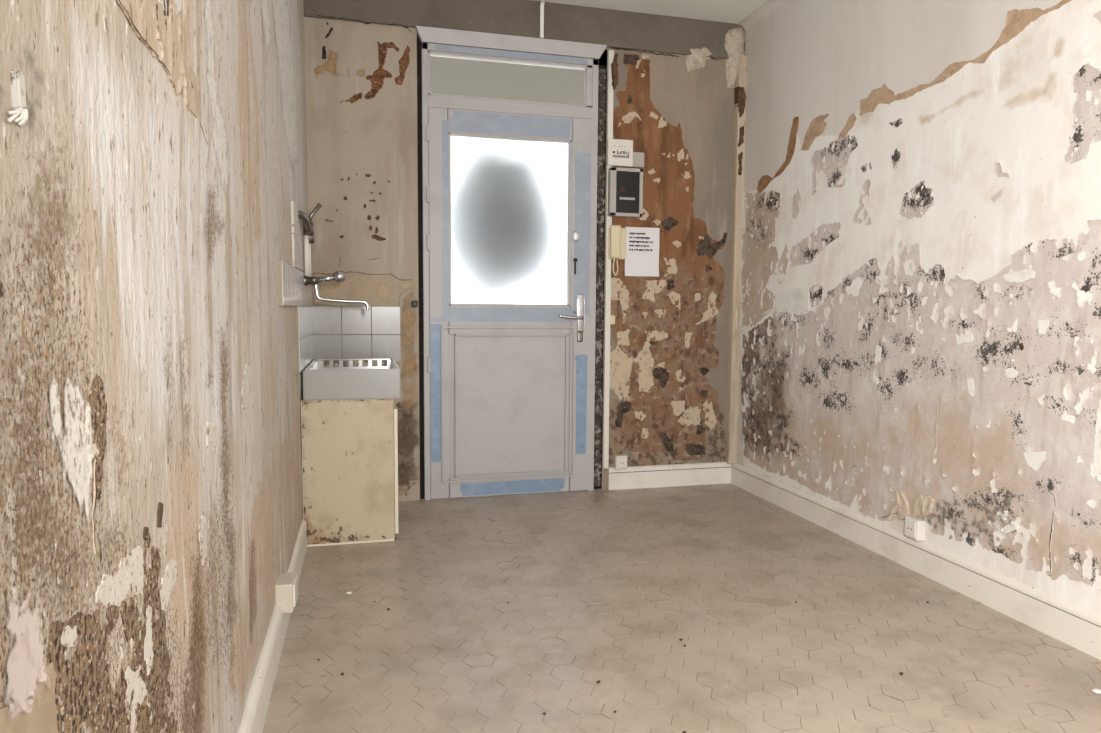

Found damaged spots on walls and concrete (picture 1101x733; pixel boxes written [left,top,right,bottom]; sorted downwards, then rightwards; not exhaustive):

crack [117,0,171,76]
peeling [115,0,200,117]
flaking render [611,53,619,90]
peeling [618,112,667,128]
flaking render [734,86,746,175]
peeling [662,149,691,192]
flaking render [1002,268,1035,282]
peeling [610,241,719,439]
flaking render [873,345,882,384]
flaking render [1023,451,1046,471]
flaking render [1093,383,1101,475]
flaking render [0,375,207,733]